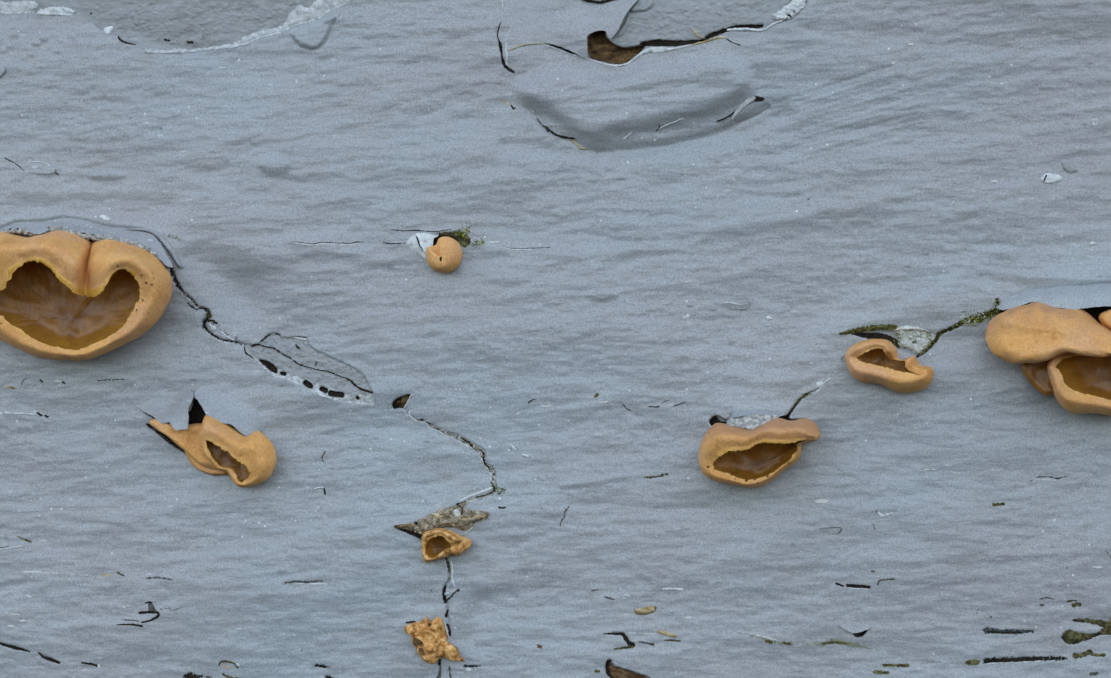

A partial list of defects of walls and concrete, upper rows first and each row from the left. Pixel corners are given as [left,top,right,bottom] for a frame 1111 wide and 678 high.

peeling [0,0,351,54]
peeling [498,0,807,67]
peeling [731,96,770,122]
crack [170,267,246,345]
spalling [244,333,375,405]
peeling [139,388,262,453]
crack [408,412,506,506]
spalling [394,502,490,540]
crack [284,578,326,586]
crack [436,558,460,678]